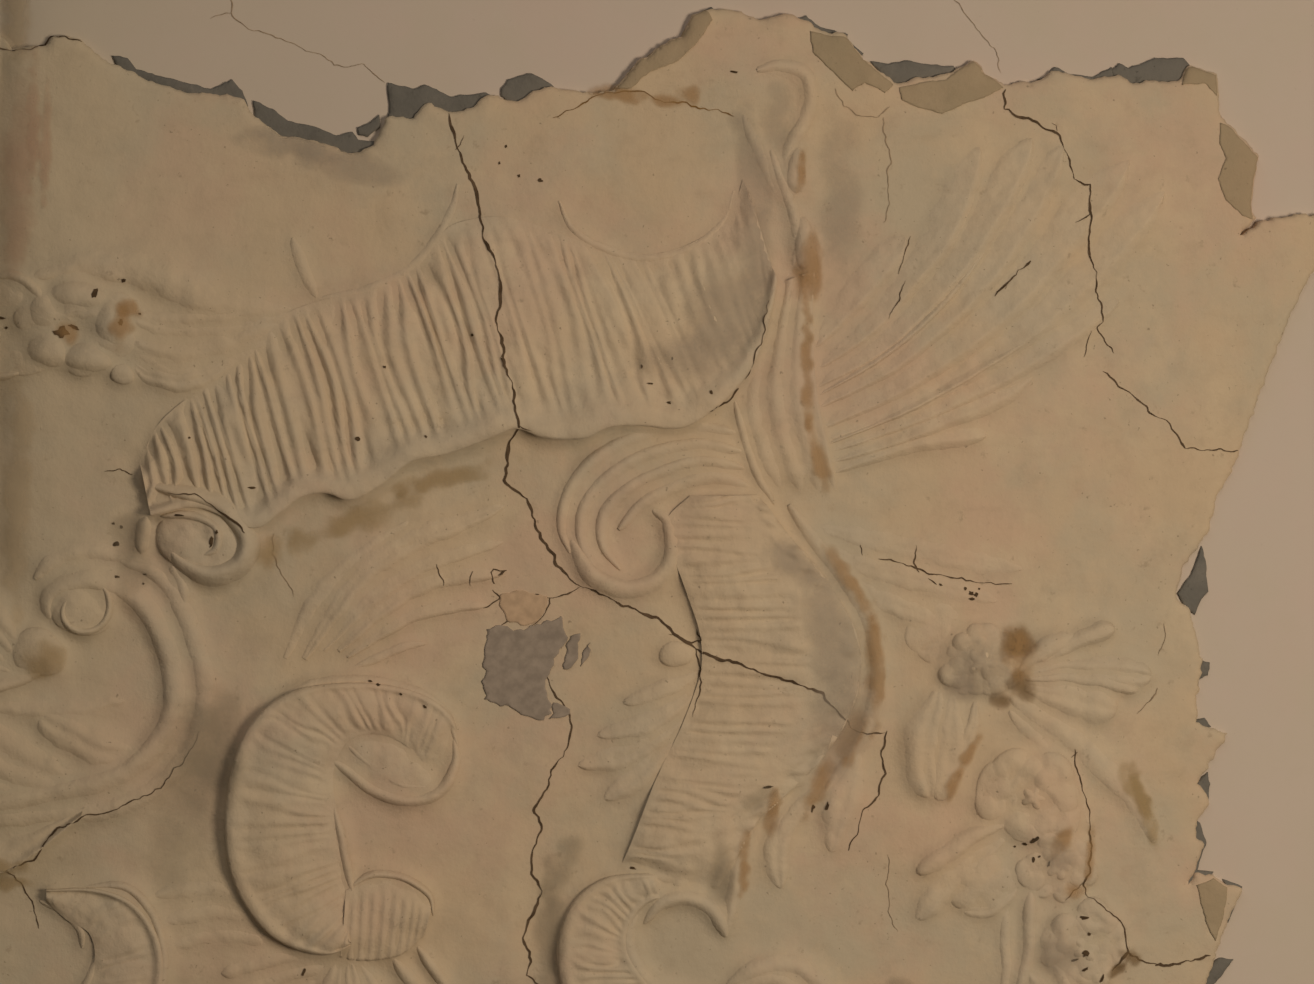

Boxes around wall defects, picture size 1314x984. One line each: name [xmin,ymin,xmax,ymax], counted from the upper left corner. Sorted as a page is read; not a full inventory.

crack [0,36,82,51]
crack [212,0,384,82]
peeling [112,56,554,153]
flaking render [799,16,1003,114]
peeling [1036,58,1217,96]
crack [835,88,911,317]
crack [954,0,1238,452]
flaking render [1218,123,1258,219]
crack [437,114,887,849]
peeling [563,633,591,670]
crack [522,677,573,984]
crack [1065,750,1211,969]